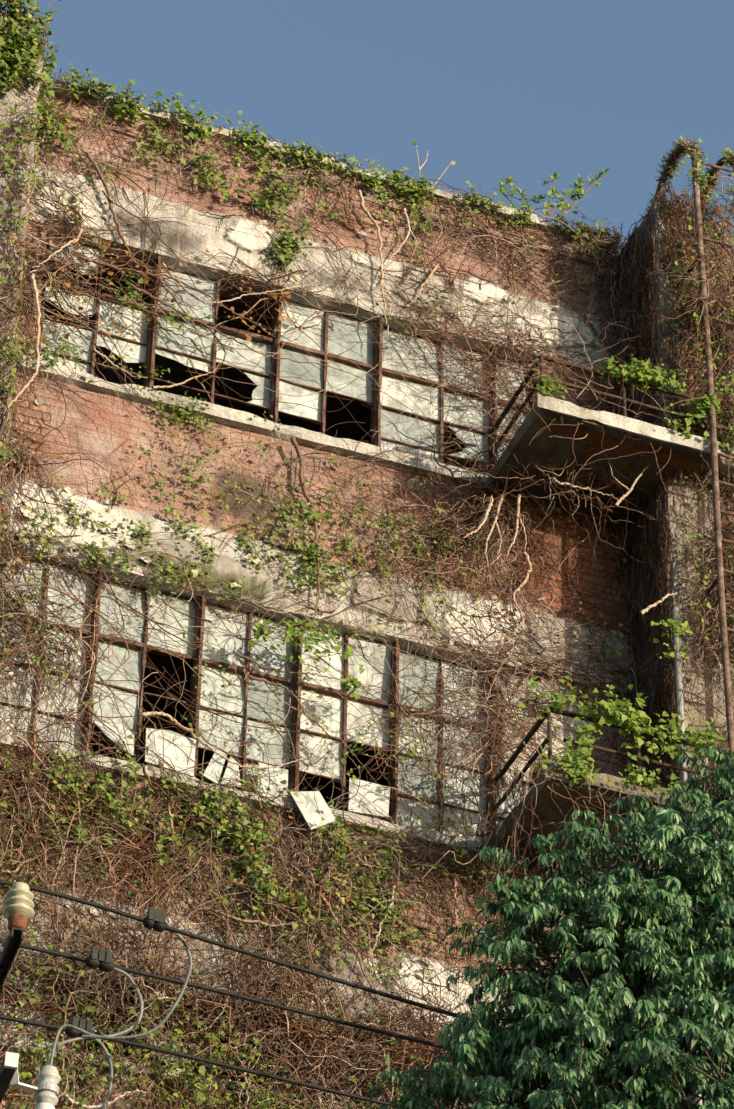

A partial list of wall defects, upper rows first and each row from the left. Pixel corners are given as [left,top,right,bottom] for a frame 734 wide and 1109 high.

flaking render [36,176,112,230]
flaking render [286,163,393,237]
flaking render [227,218,274,252]